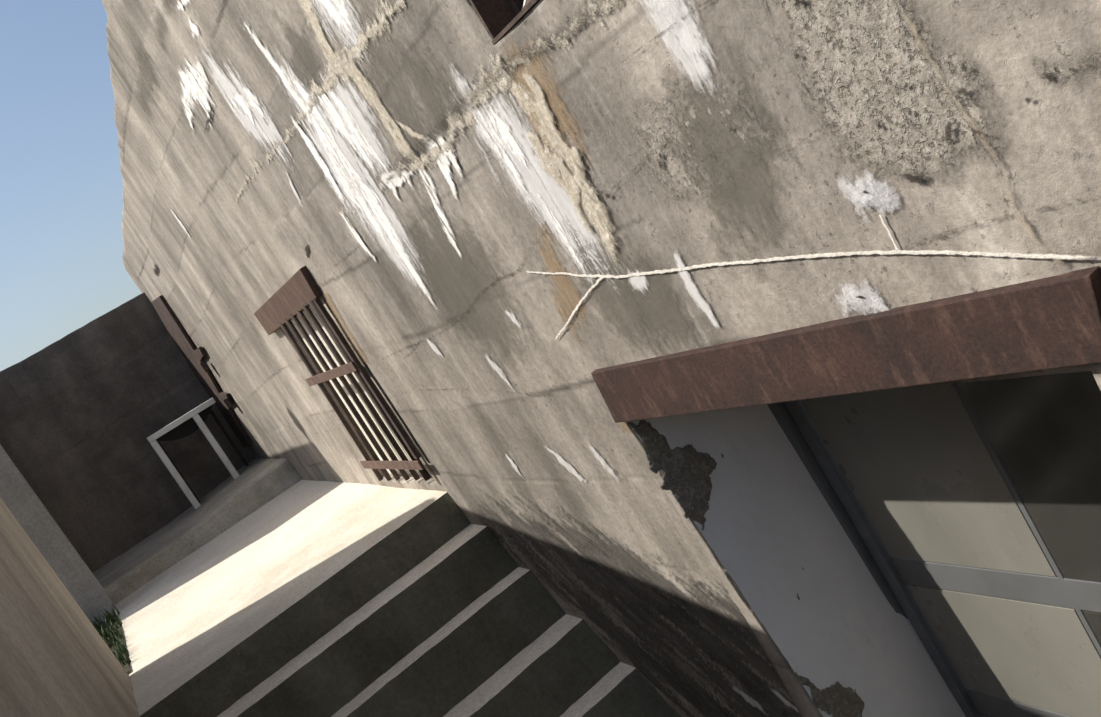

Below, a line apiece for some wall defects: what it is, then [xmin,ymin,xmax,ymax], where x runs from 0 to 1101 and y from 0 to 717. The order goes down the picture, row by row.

damp [156,0,191,45]
damp [181,74,212,129]
damp [245,0,692,364]
damp [641,0,776,257]
crack [467,0,1101,340]
spalling [777,0,1003,183]
peeling [629,419,723,530]
peeling [791,670,864,717]